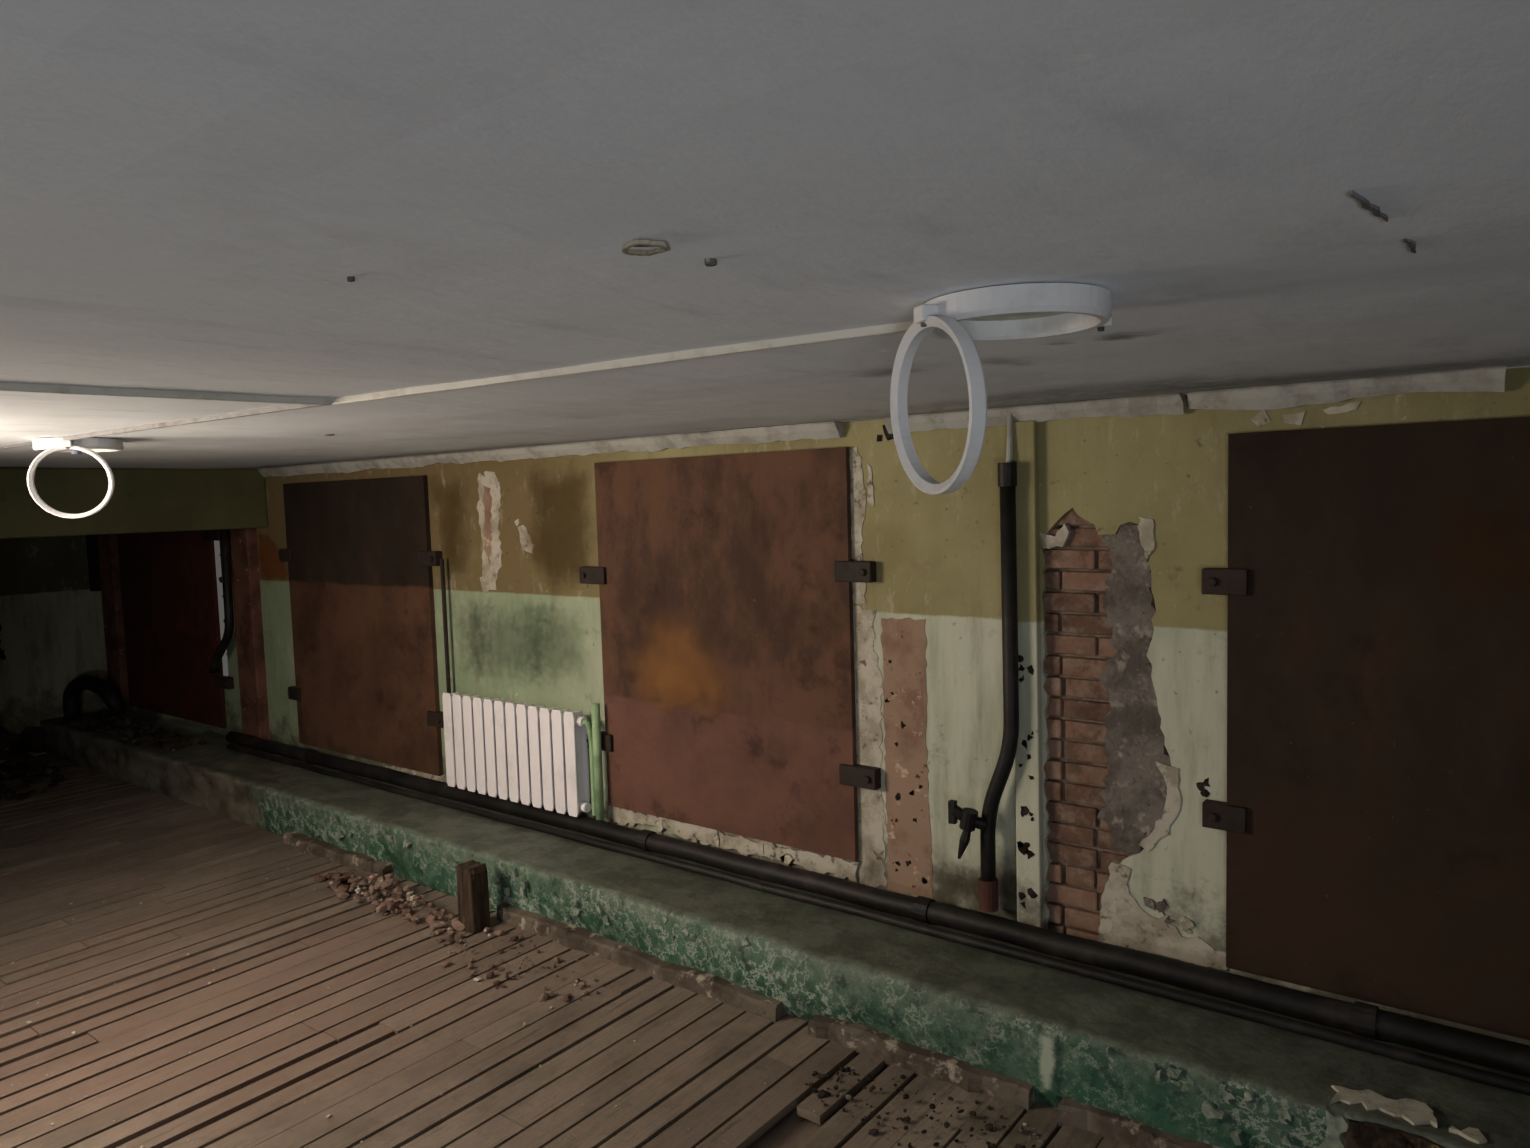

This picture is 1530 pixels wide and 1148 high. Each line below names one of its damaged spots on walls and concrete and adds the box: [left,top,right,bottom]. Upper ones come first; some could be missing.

spalling [1017,508,1227,970]
peeling [1201,1081,1294,1148]
spalling [1319,1085,1487,1148]